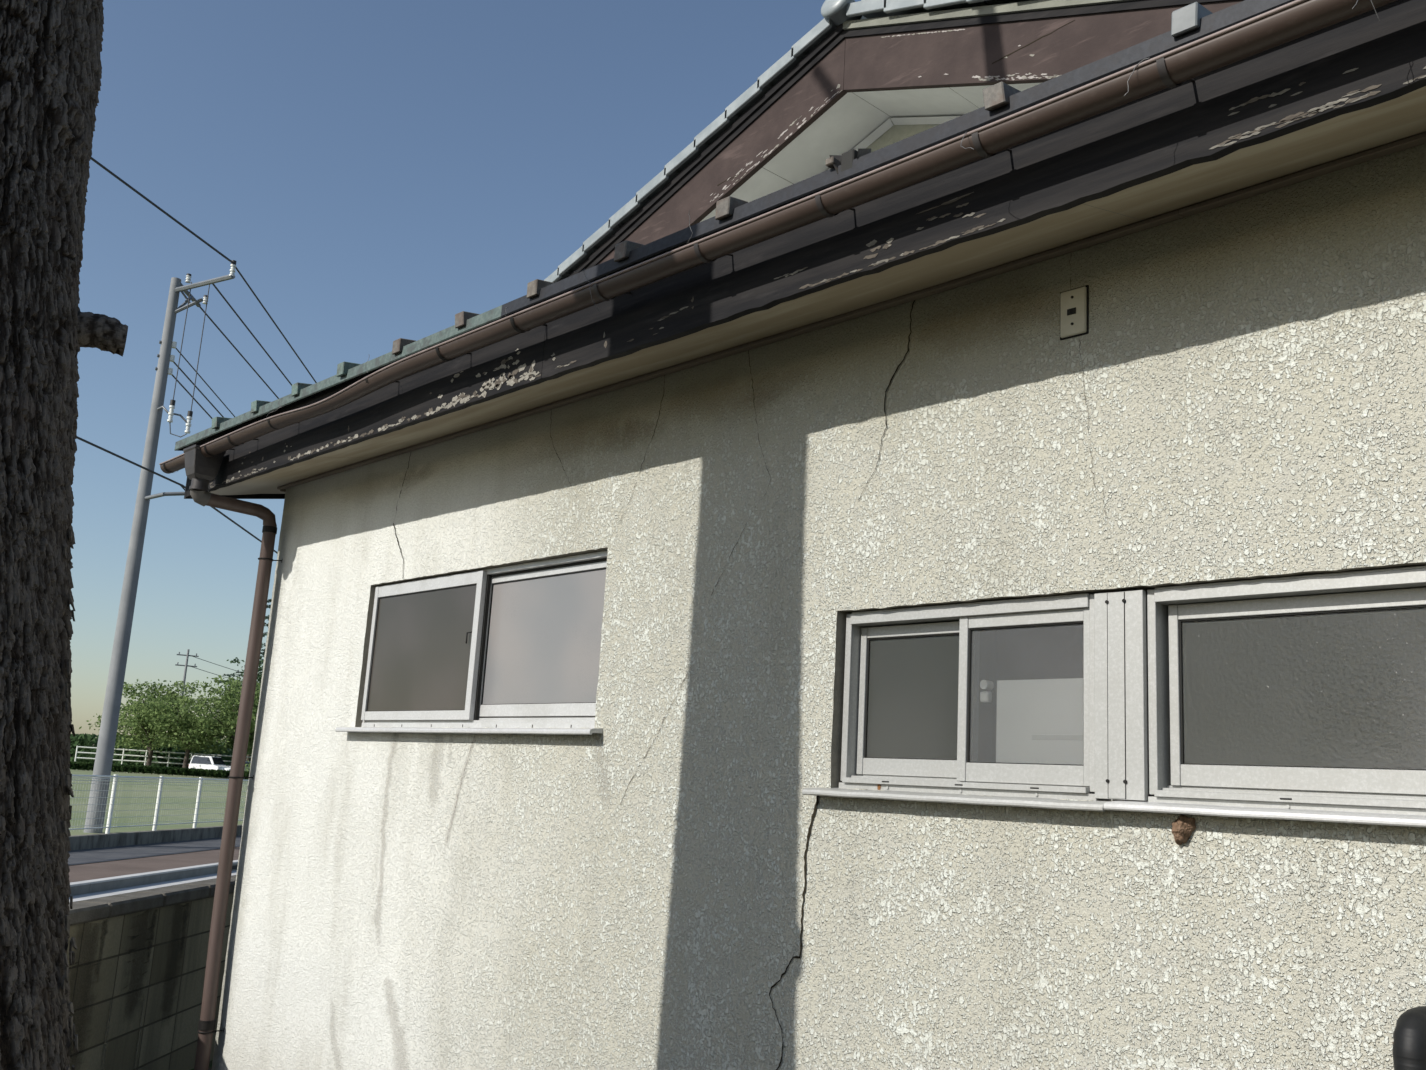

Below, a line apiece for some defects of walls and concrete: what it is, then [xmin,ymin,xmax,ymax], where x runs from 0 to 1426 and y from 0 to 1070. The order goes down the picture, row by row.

peeling [1210,82,1382,149]
peeling [210,348,541,488]
crack [858,300,915,500]
crack [769,795,819,1070]